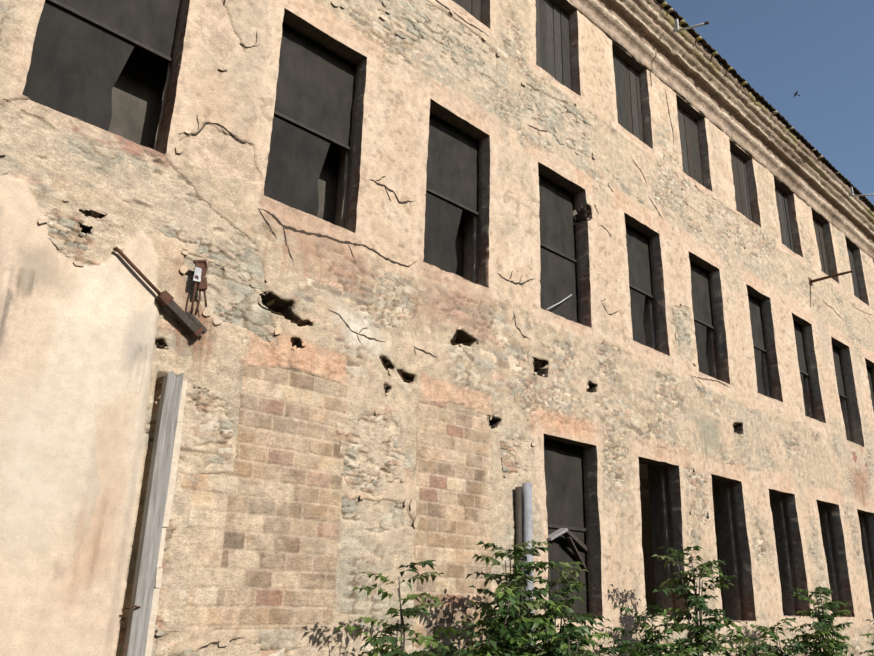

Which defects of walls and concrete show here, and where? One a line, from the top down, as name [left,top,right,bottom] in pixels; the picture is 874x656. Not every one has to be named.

spalling [331,0,410,20]
crack [178,115,254,145]
spalling [522,81,597,159]
crack [370,176,412,204]
spalling [0,99,282,345]
crack [258,208,417,267]
crack [497,271,536,285]
crack [328,309,385,345]